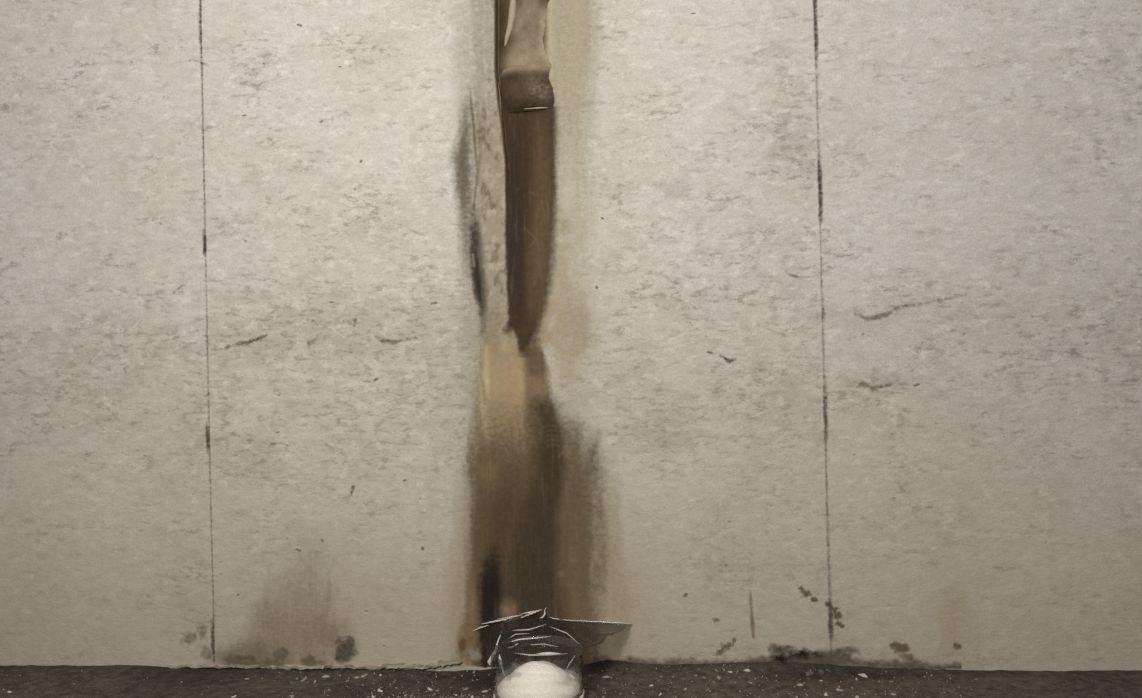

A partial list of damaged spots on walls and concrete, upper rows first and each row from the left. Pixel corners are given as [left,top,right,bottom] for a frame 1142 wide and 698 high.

leakage [452,0,962,669]
leakage [226,642,316,666]
leakage [336,637,354,661]